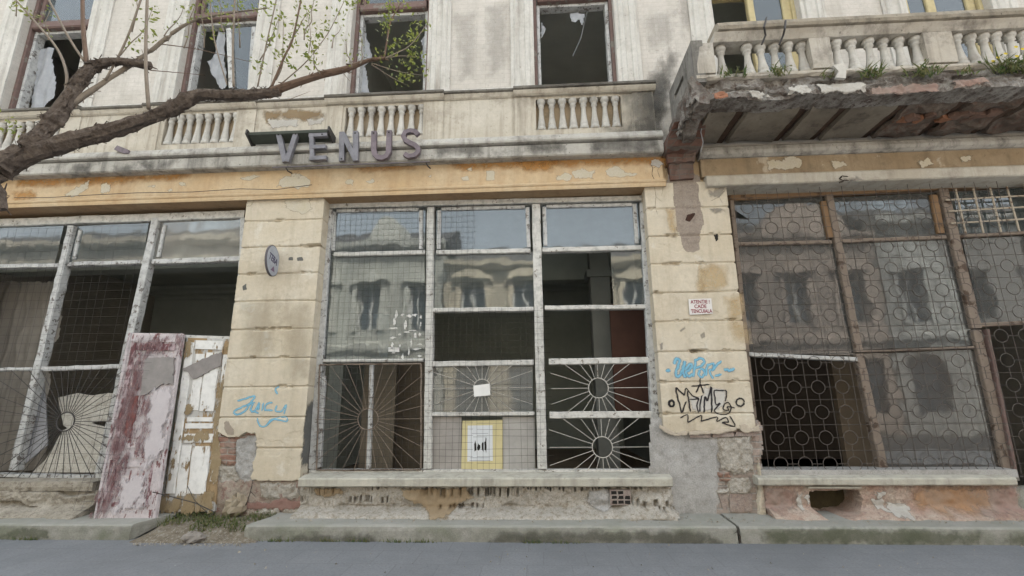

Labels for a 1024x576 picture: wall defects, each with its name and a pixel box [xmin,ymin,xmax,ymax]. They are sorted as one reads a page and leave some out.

spalling [788,82,939,95]
spalling [954,77,990,88]
peeling [268,118,324,128]
peeling [767,156,802,170]
peeling [556,166,637,181]
peeling [651,159,704,252]
flaking render [212,421,308,516]
flaking render [649,417,764,515]
flaking render [314,488,343,498]
flaking render [401,487,474,520]
peeling [871,492,916,521]